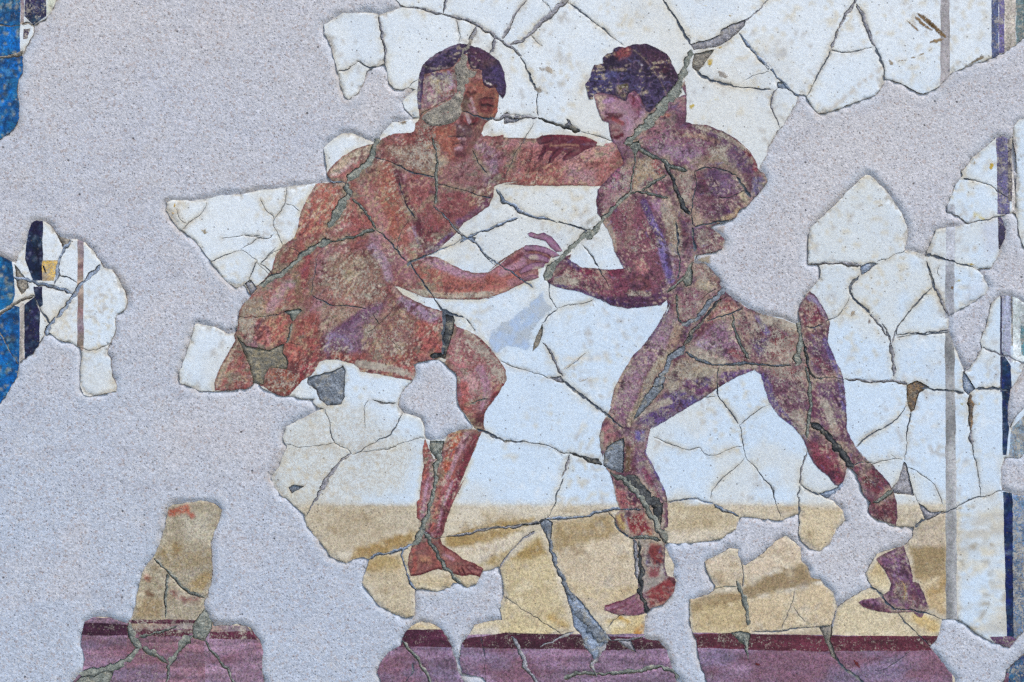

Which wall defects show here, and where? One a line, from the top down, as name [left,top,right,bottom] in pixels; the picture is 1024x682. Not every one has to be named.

spalling [15,265,29,294]
spalling [236,241,321,295]
spalling [851,262,877,290]
spalling [216,309,302,387]
crack [211,0,1024,682]
spalling [307,366,346,406]
spalling [962,364,976,395]
spalling [819,482,843,501]
spalling [837,462,945,608]
spalling [565,592,663,660]
spalling [810,625,838,661]